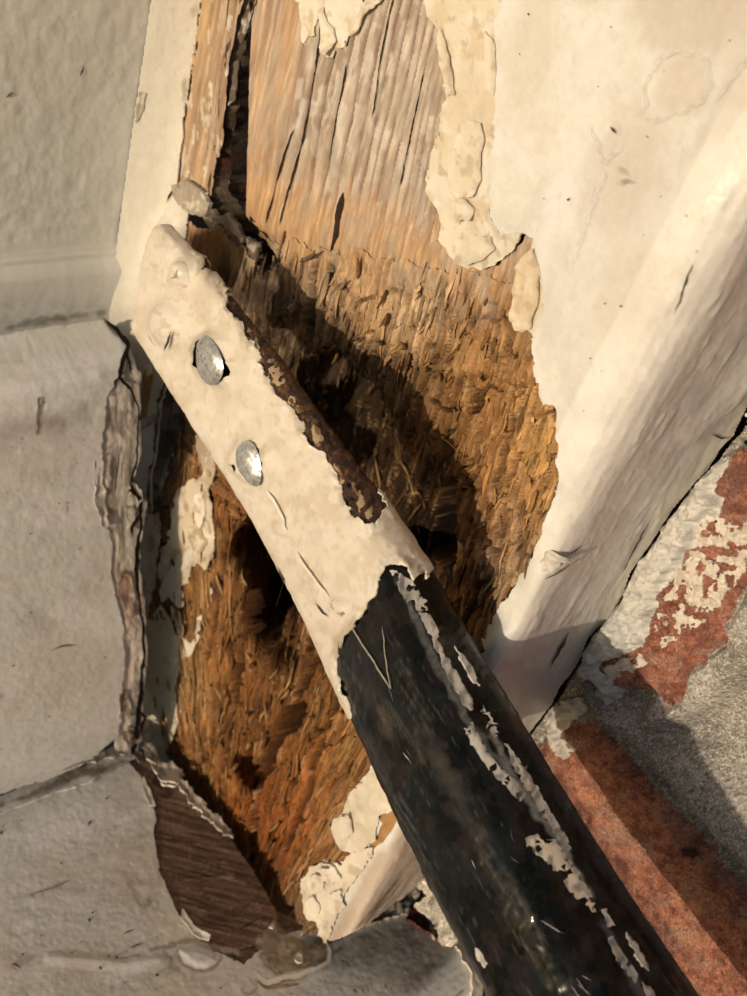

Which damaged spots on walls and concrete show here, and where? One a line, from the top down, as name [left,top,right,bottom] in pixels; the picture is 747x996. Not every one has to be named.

crack [208,0,334,283]
peeling [178,0,543,337]
peeling [94,454,110,527]
crack [62,319,184,788]
peeling [140,363,156,430]
peeling [117,395,280,952]
peeling [300,766,397,943]